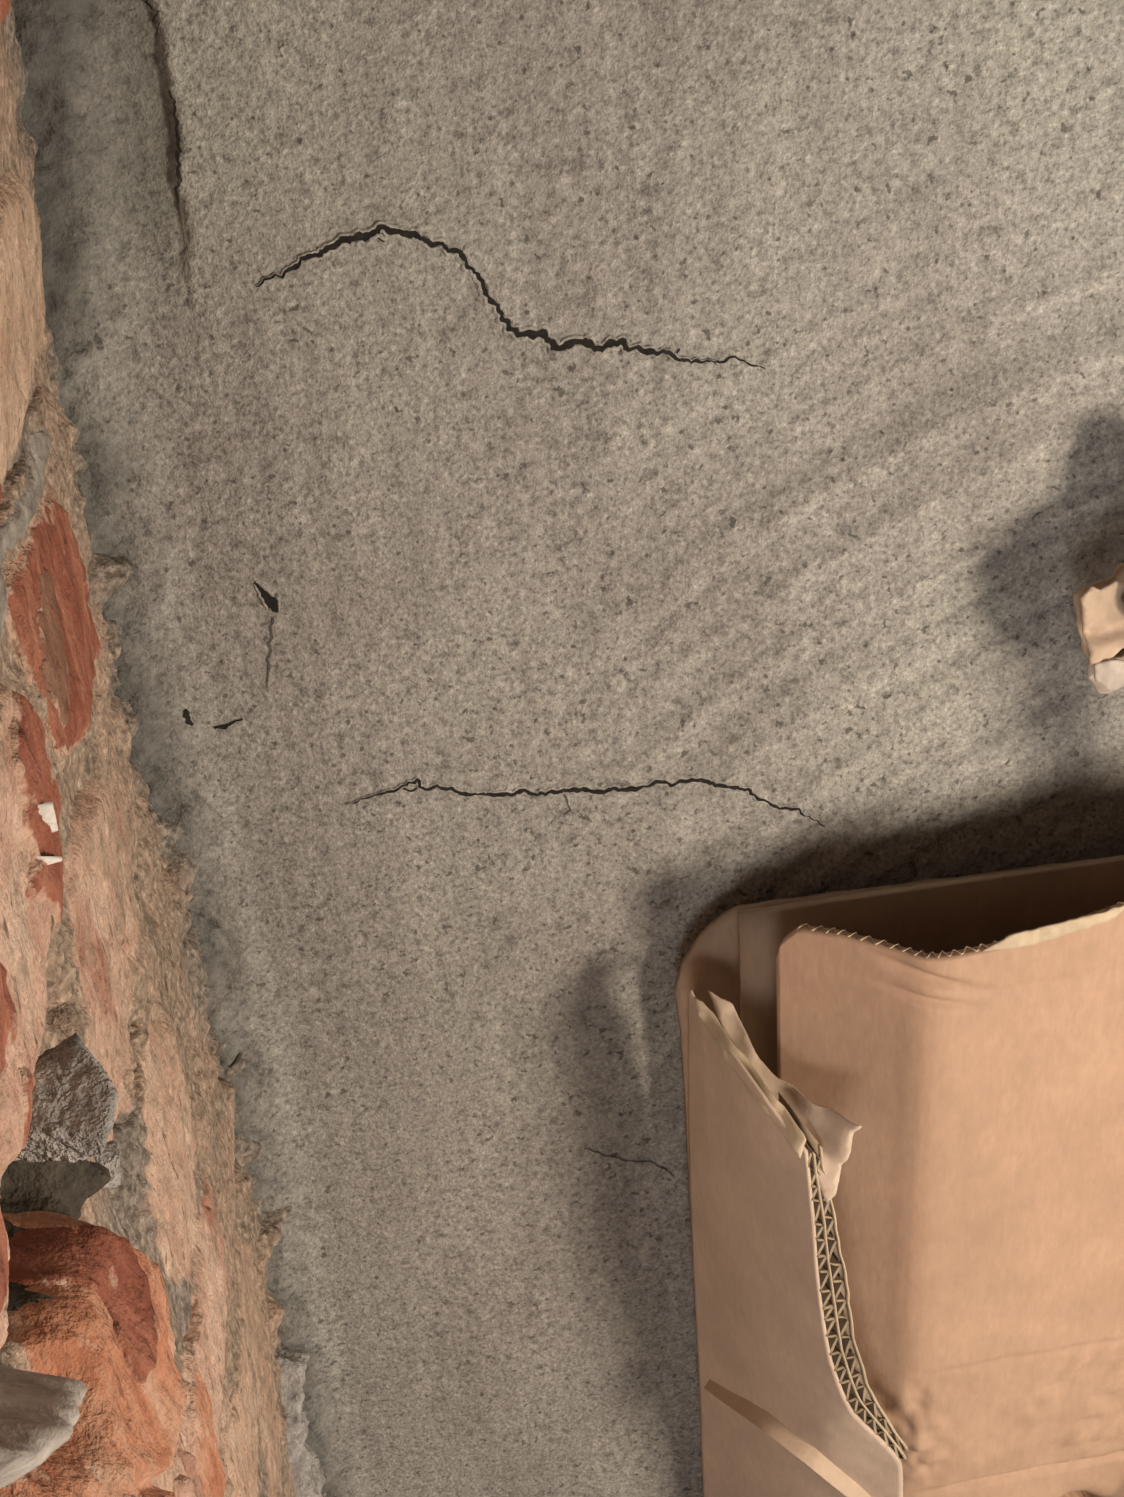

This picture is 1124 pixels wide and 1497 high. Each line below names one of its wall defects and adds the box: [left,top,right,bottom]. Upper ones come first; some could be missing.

crack [168,90,183,207]
crack [255,220,766,369]
crack [346,775,826,828]